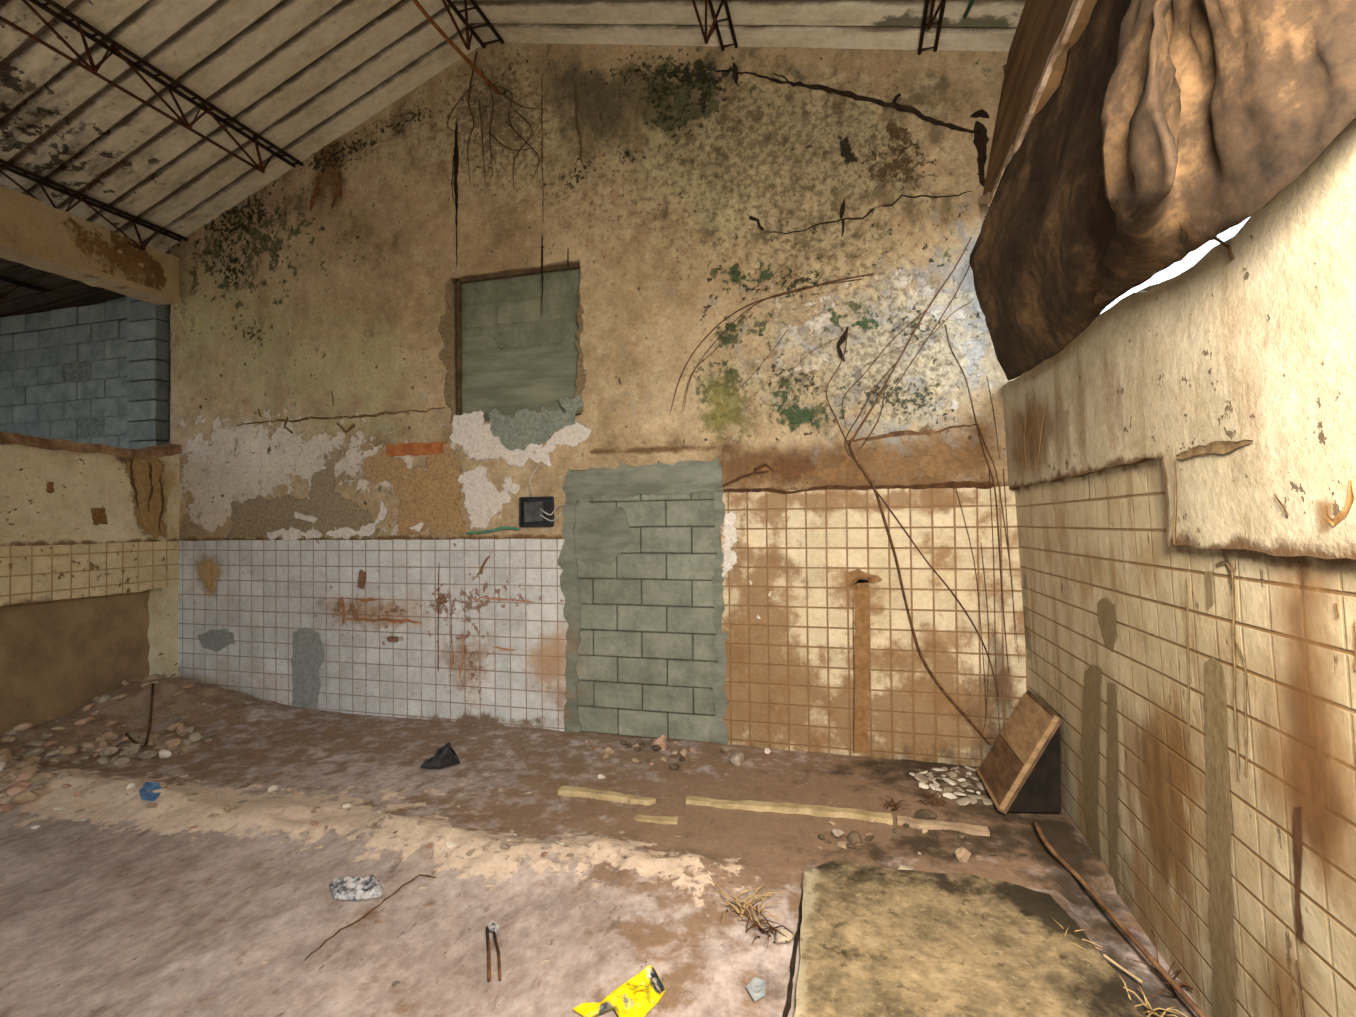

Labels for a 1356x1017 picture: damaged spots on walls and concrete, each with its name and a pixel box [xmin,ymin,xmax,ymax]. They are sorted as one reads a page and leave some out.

damp [548,53,728,200]
crack [715,62,990,237]
damp [168,188,283,293]
peeling [229,279,592,541]
rust [341,597,422,626]
damp [1268,960,1305,1017]